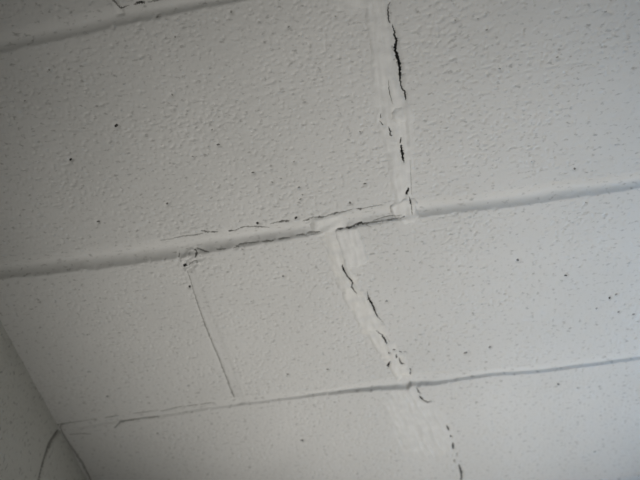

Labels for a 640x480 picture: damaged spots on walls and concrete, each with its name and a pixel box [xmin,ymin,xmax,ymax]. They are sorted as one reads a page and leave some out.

crack [387,3,406,101]
crack [165,114,412,250]
crack [342,265,431,403]
crack [446,425,462,480]